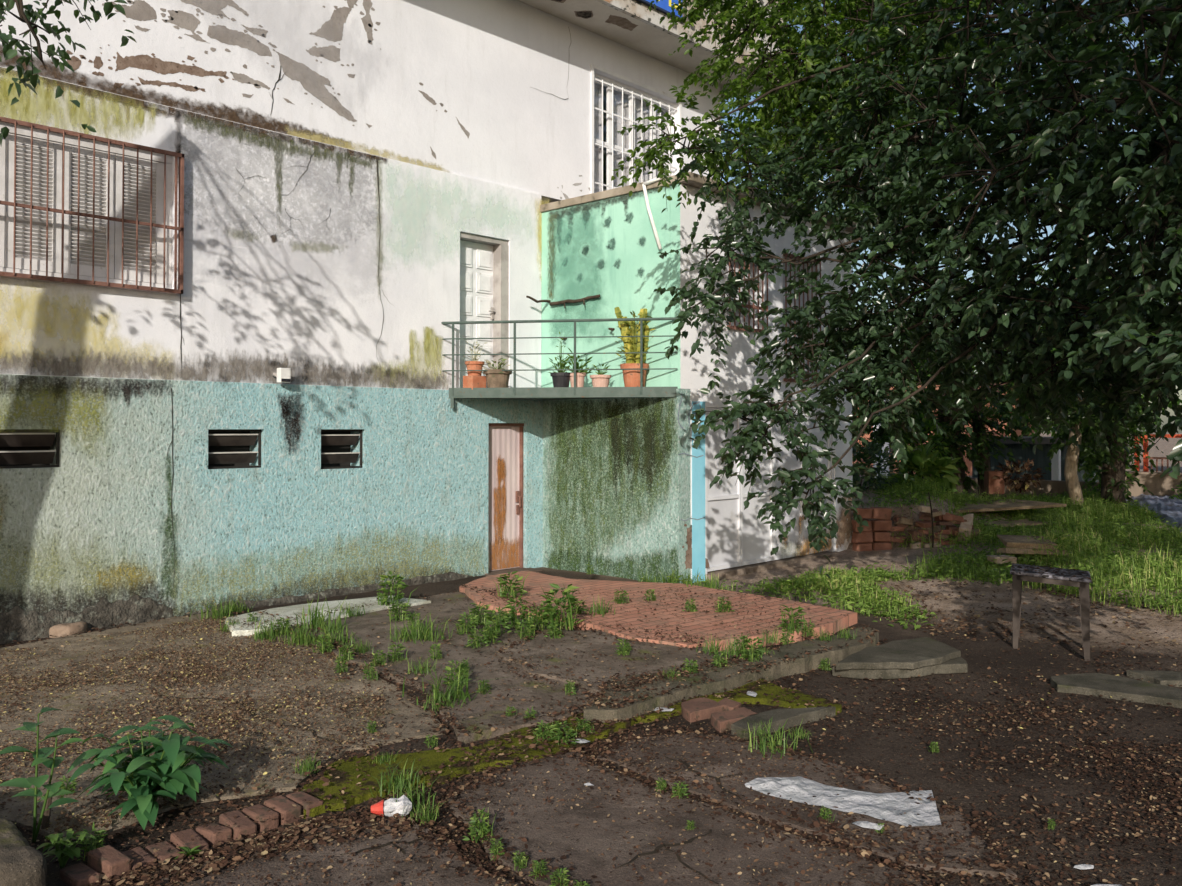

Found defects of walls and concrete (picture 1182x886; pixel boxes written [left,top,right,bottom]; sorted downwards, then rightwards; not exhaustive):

spalling [551,0,638,31]
leakage [0,45,387,211]
peeling [66,0,381,128]
peeling [418,82,470,138]
crack [236,150,331,235]
leakage [0,290,448,452]
leakage [556,401,673,496]
rust [490,458,520,570]
leakage [0,565,458,617]